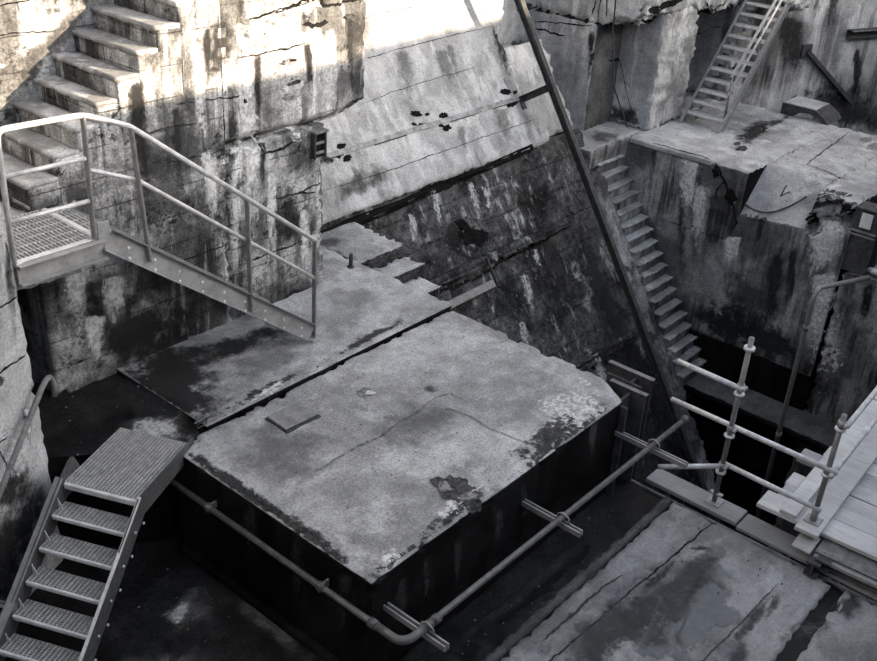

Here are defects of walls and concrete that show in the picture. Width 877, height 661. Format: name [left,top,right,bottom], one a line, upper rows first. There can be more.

crack [528,0,607,36]
crack [369,26,489,58]
spalling [281,79,304,101]
damp [173,17,310,267]
crack [276,119,536,200]
efflorescence [431,191,441,222]
efflorescence [468,183,490,216]
spalling [805,188,856,224]
efflorescence [408,214,417,241]
crack [314,392,529,472]
spalling [430,475,485,524]
damp [566,555,718,661]